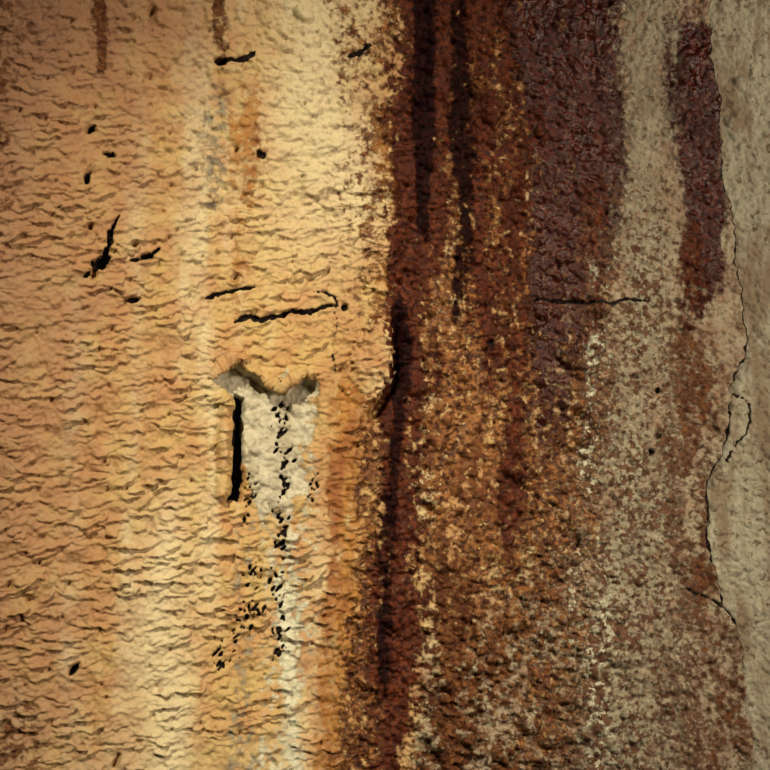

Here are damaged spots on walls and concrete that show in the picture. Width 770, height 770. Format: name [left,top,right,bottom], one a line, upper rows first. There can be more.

crack [83,215,120,278]
crack [130,248,161,262]
spalling [209,350,319,528]
crack [234,291,339,371]
corrosion [313,0,641,770]
crack [529,297,649,306]
corrosion [653,15,753,770]
crack [686,1,752,680]